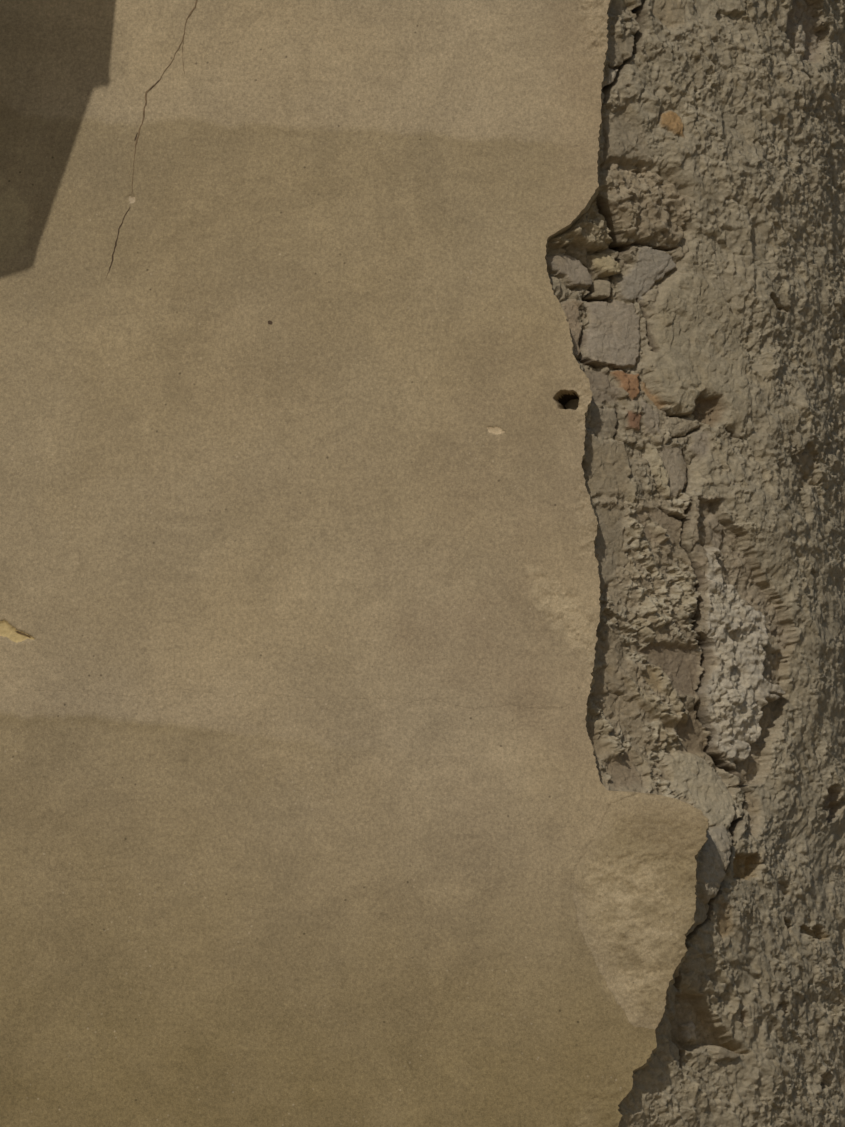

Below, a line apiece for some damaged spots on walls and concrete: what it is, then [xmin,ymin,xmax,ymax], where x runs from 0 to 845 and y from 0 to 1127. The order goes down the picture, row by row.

crack [107,0,197,275]
crack [576,0,680,382]
crack [612,407,620,438]
spalling [545,0,798,903]
peeling [0,620,35,643]
crack [659,407,751,992]
crack [674,1043,687,1068]
spalling [670,991,745,1062]